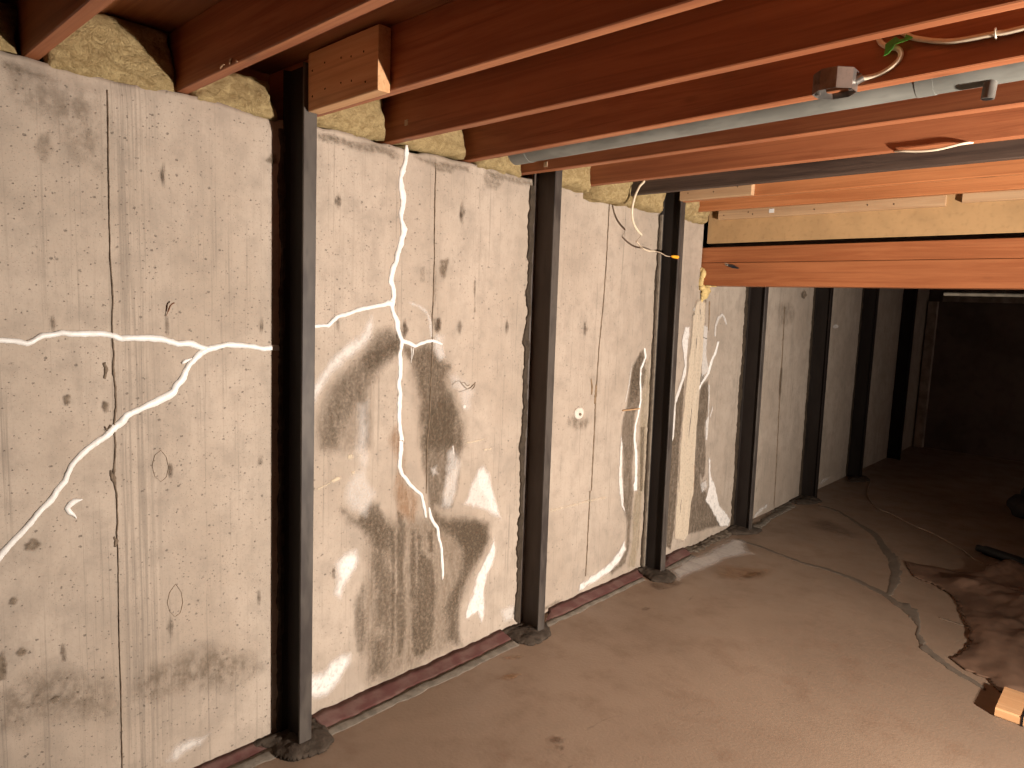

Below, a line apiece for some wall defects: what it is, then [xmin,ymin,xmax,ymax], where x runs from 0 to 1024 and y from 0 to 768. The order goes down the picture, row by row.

crack [0,330,279,561]
leakage [315,324,371,392]
crack [315,145,444,580]
leakage [408,348,466,506]
efflorescence [467,469,497,513]
leakage [580,352,645,590]
crack [633,348,647,491]
efflorescence [312,657,348,696]
efflorescence [337,554,356,594]
leakage [360,507,495,673]
crack [738,505,986,690]